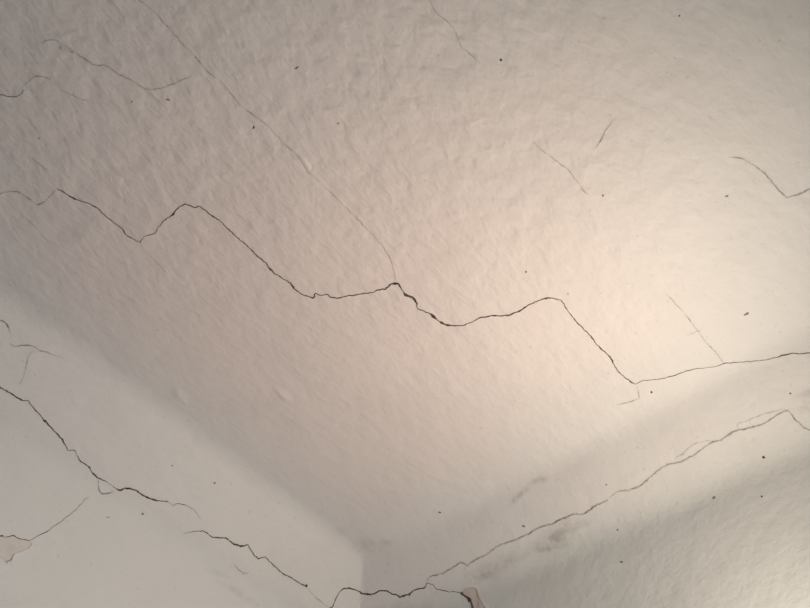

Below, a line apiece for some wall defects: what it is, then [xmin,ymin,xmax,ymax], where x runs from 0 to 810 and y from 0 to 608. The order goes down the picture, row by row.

crack [58,189,807,384]
crack [0,387,308,587]
crack [330,575,459,608]
peeling [459,585,489,608]